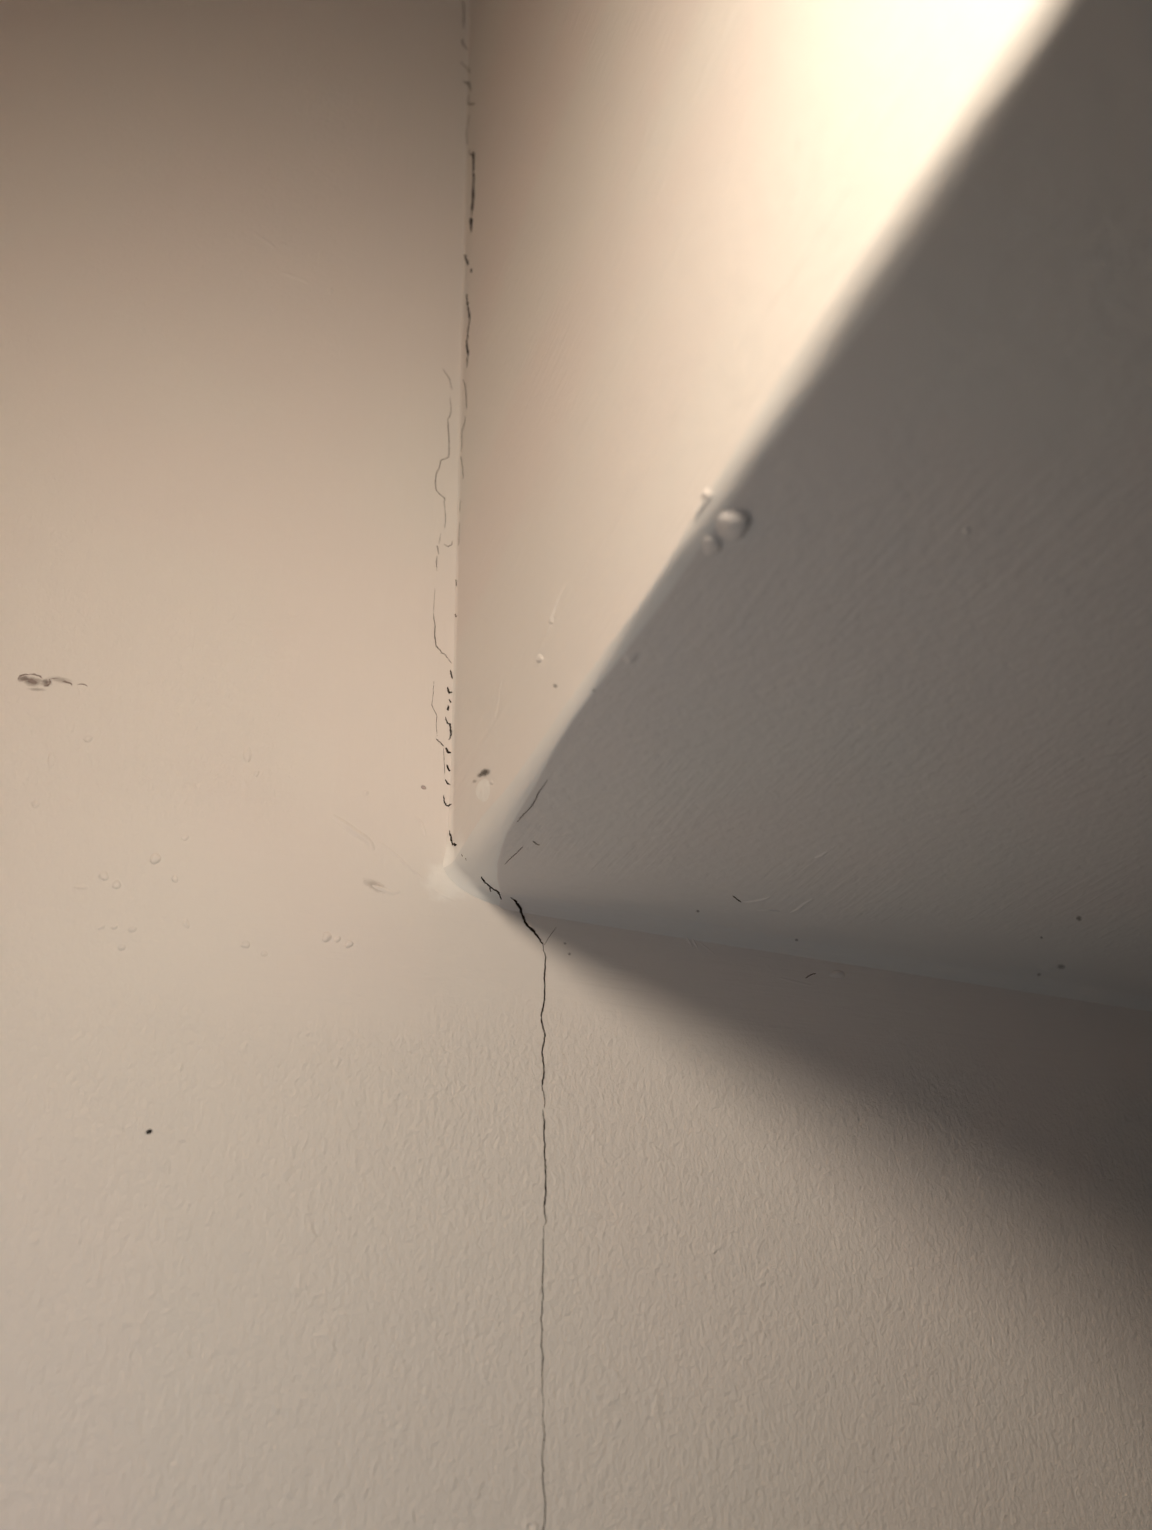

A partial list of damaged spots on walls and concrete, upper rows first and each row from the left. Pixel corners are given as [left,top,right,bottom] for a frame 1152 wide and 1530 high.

crack [432,1,556,1530]